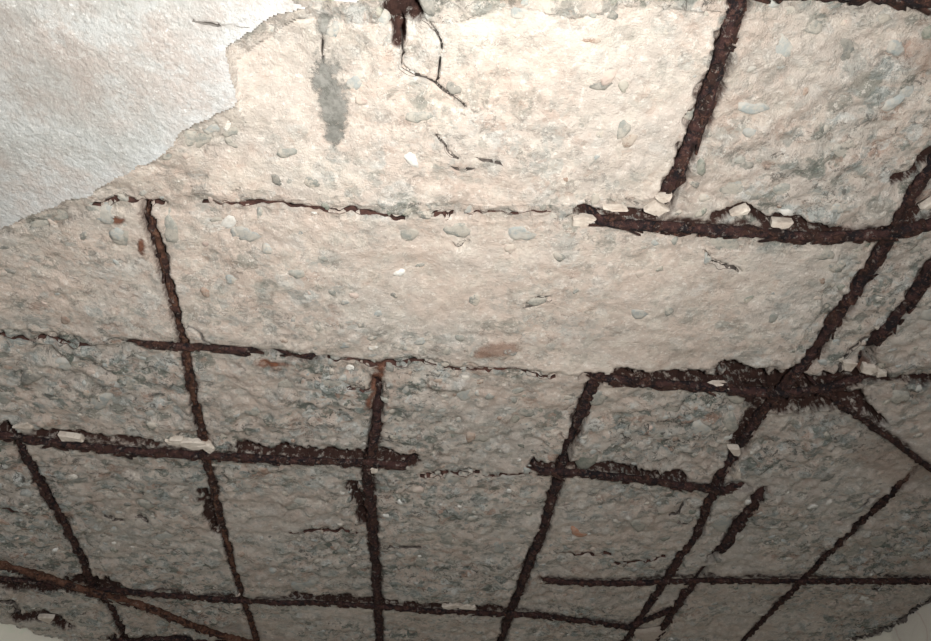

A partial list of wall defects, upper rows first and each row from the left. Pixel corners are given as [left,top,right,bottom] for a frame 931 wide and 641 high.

spalling [660,0,747,194]
spalling [885,153,931,229]
spalling [144,200,189,344]
spalling [181,351,208,442]
spalling [127,339,264,357]
spalling [275,349,317,360]
spalling [363,375,384,461]
rust [365,362,385,410]
spalling [580,178,931,472]
spalling [0,431,417,641]
spalling [507,372,931,641]
spalling [93,583,689,641]